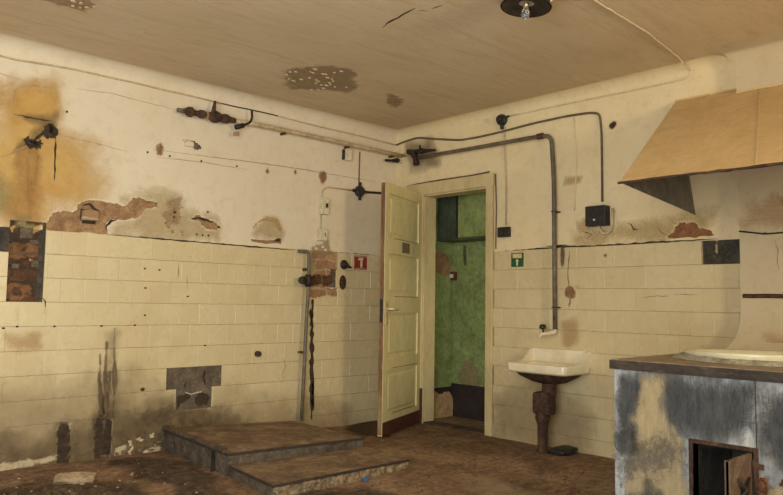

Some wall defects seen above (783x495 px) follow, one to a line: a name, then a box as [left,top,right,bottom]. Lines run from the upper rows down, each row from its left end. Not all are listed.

peeling [285,68,348,95]
water stain [0,100,98,232]
peeling [0,197,184,307]
spalling [191,215,220,230]
flaking render [310,241,337,298]
spalling [435,252,451,277]
rust [560,247,575,307]
peeling [668,222,740,264]
water stain [98,341,117,418]
peeling [166,365,221,411]
water stain [625,376,688,495]
rust [759,473,783,495]